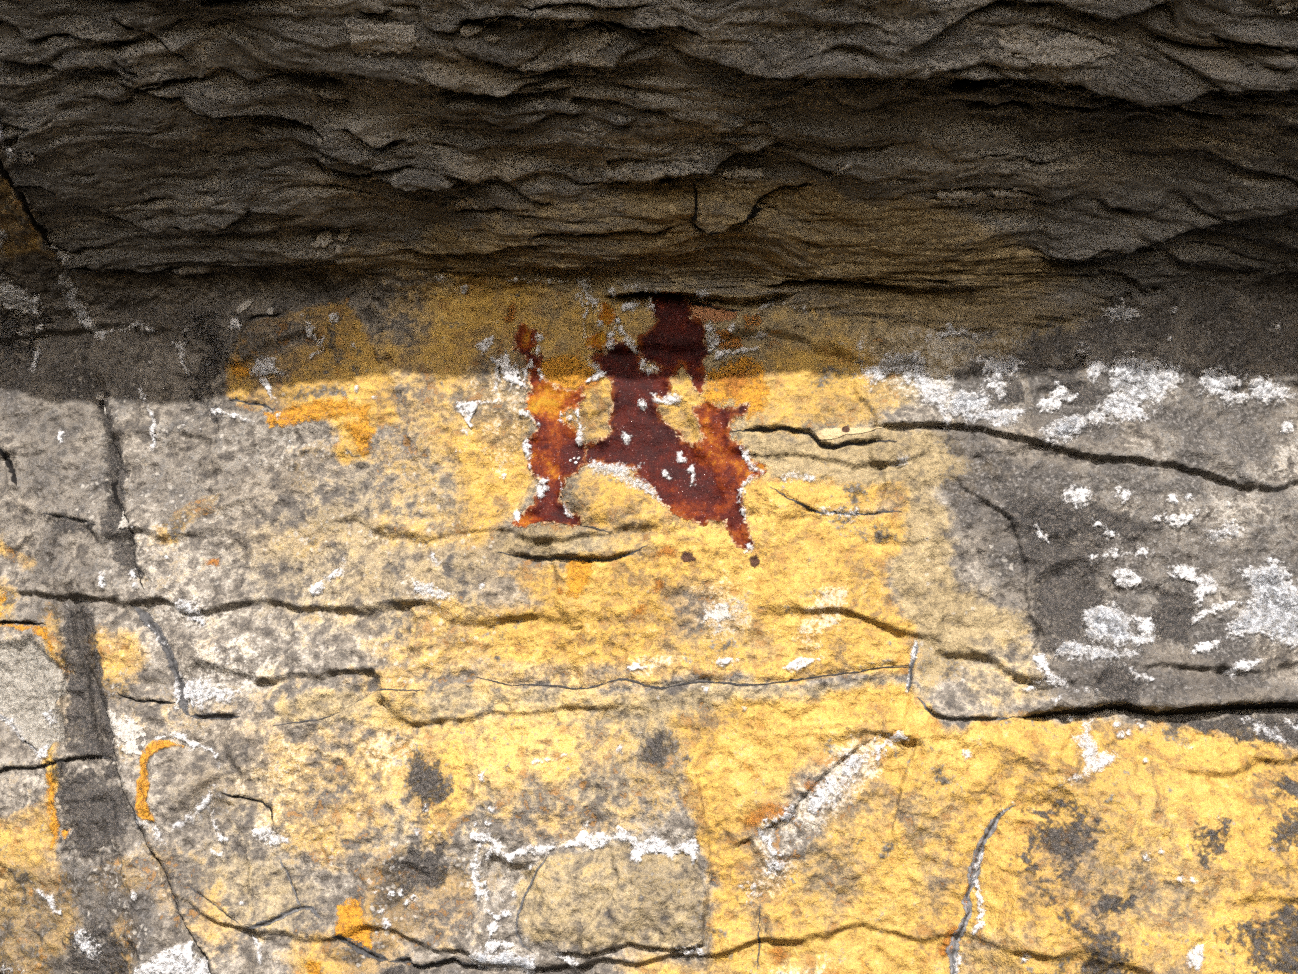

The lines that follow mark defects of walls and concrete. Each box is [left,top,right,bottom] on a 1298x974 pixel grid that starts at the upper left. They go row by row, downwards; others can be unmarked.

crack [454,3,706,52]
crack [1210,33,1288,52]
crack [812,77,1282,109]
crack [112,62,813,256]
water stain [1103,299,1143,320]
water stain [865,323,1183,443]
water stain [1200,365,1292,405]
rust [504,291,770,568]
water stain [995,477,1298,778]
crack [0,437,496,974]
crack [476,642,1298,721]